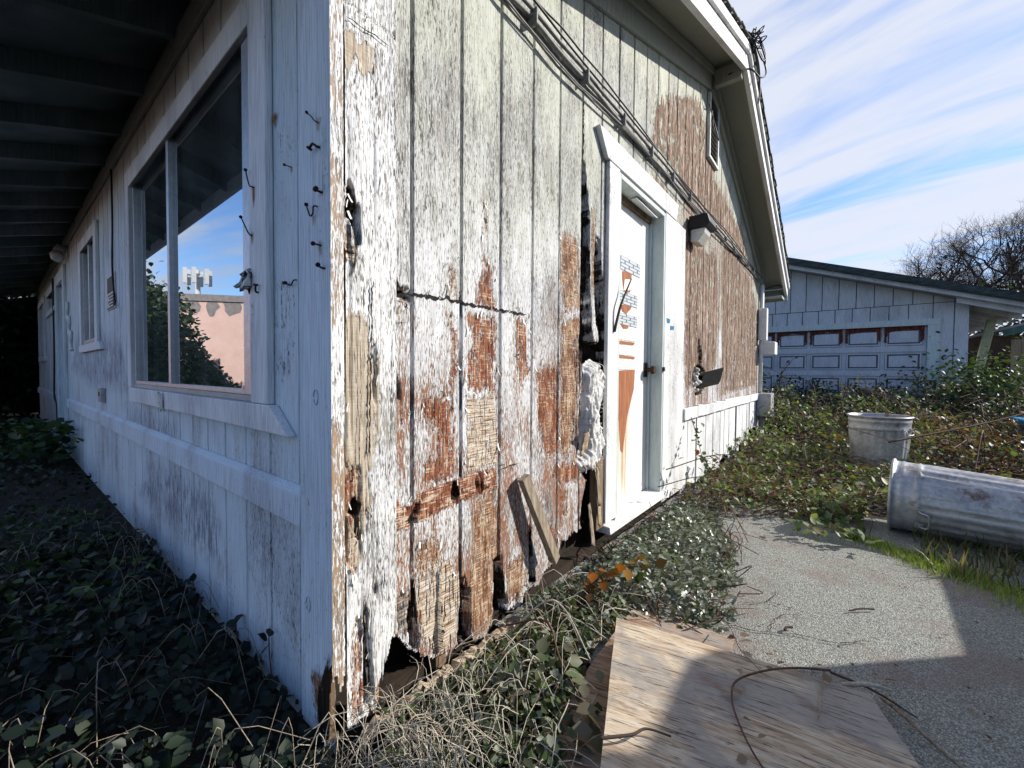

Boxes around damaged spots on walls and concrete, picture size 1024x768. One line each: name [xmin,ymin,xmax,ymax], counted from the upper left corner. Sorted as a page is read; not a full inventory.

peeling [344,28,378,79]
peeling [344,307,382,584]
crack [359,277,526,471]
peeling [396,198,530,636]
peeling [514,204,597,566]
peeling [651,88,757,397]